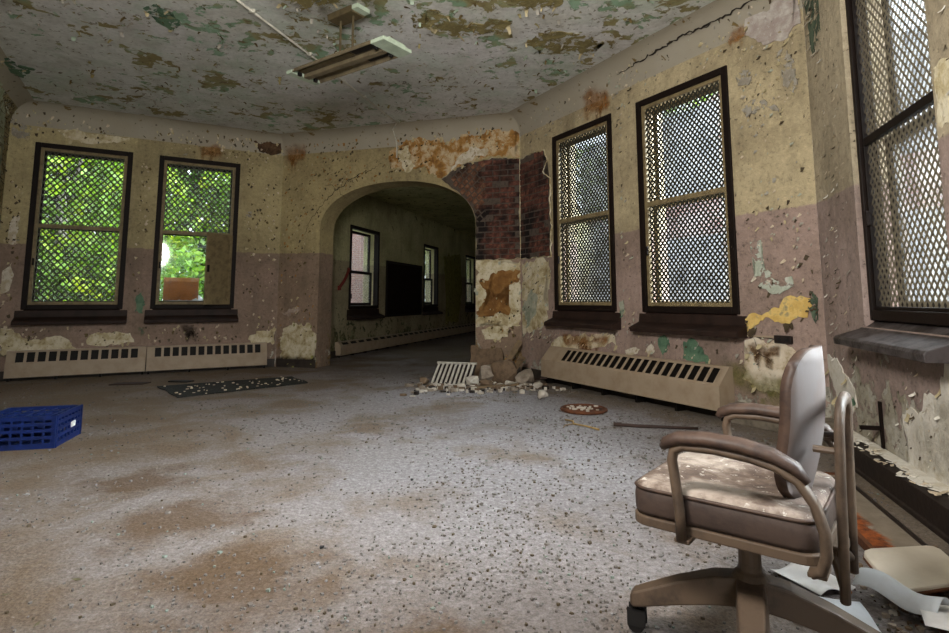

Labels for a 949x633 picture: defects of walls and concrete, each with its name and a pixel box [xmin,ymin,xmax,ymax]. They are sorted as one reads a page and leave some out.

peeling [52,0,182,46]
peeling [276,0,340,56]
crack [617,0,752,75]
peeling [0,99,134,356]
peeling [145,65,718,368]
flaking render [825,350,949,496]